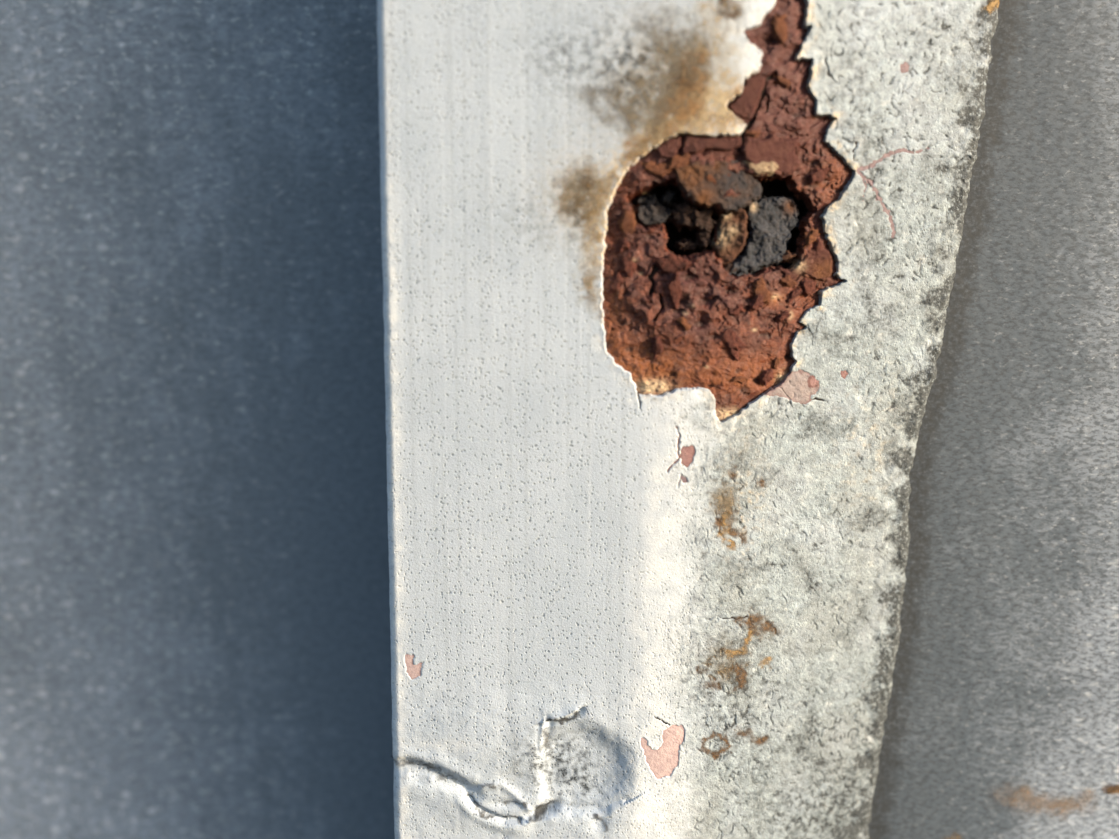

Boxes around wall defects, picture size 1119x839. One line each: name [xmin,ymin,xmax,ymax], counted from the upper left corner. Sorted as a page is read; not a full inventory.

corrosion [566,0,852,421]
peeling [761,370,824,404]
corrosion [710,466,747,549]
peeling [405,654,423,680]
corrosion [697,615,780,690]
peeling [640,716,684,779]
corrosion [699,731,768,759]